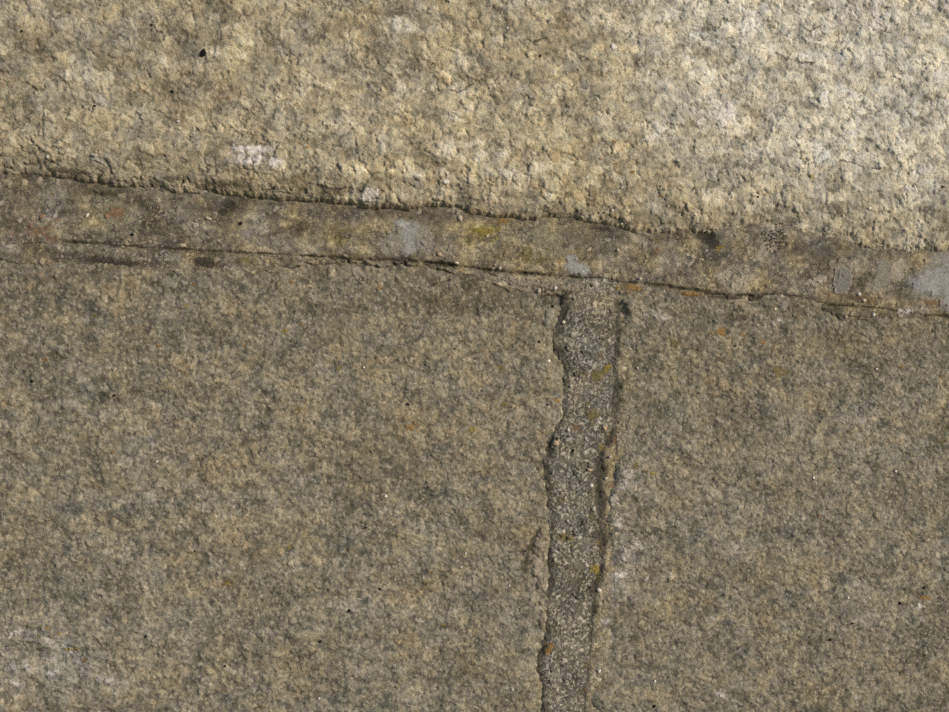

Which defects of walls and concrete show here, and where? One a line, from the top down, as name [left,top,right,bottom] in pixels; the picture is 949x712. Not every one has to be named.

crack [69,241,579,384]
crack [811,304,932,319]